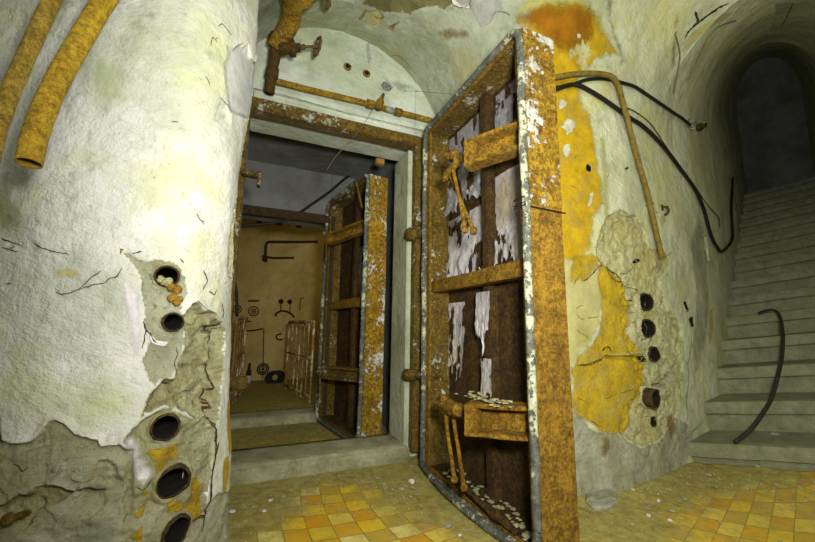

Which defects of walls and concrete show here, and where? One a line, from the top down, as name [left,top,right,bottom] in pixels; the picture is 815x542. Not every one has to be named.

crack [56,248,142,294]
peeling [0,253,231,542]
crack [194,270,224,532]
spalling [227,191,238,278]
peeling [226,37,257,167]
peeling [363,0,502,26]
rust [518,0,616,261]
spalling [573,208,694,496]